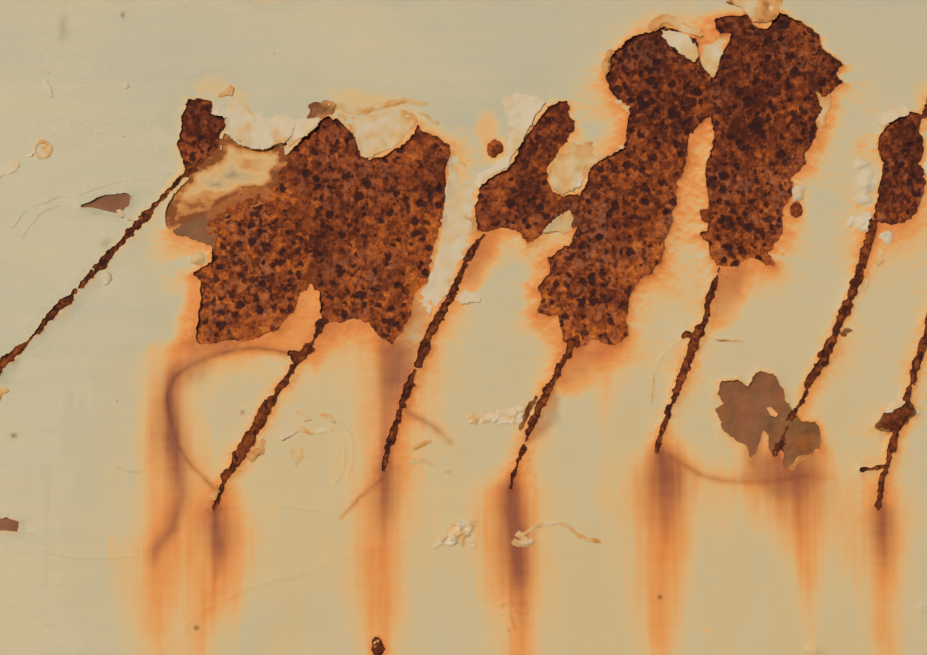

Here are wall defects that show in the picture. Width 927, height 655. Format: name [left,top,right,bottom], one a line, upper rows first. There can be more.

peeling [81,193,138,221]
rust [61,65,505,655]
rust [284,345,927,655]
rust [464,0,927,455]
peeling [704,360,821,479]